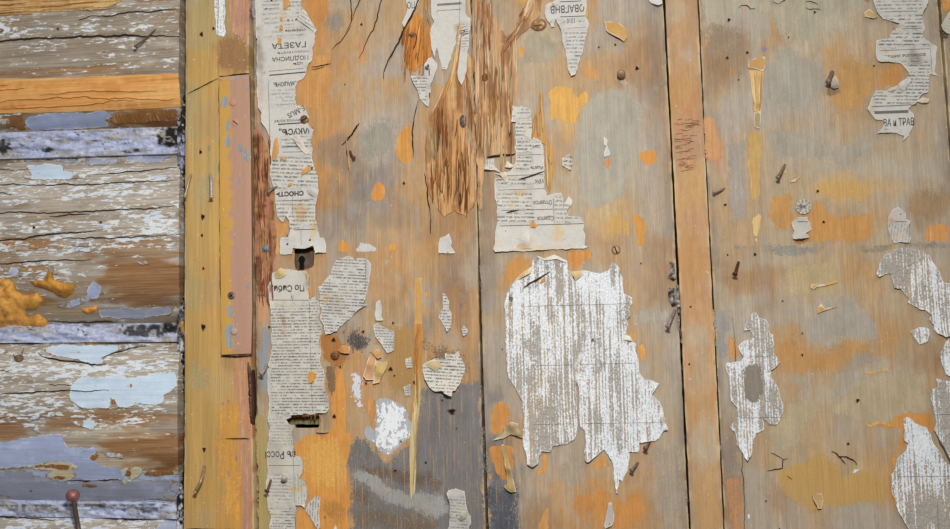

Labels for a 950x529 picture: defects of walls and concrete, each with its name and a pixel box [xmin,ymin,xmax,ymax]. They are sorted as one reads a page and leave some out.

crack [313,0,382,69]
crack [383,0,419,79]
peeling [295,54,337,112]
peeling [13,109,177,131]
peeling [13,155,172,180]
peeling [58,280,174,319]
peeling [501,256,532,291]
peeling [568,250,592,269]
peeling [44,344,150,364]
peeling [69,372,177,431]
peeling [0,425,177,503]
peeling [874,411,935,511]